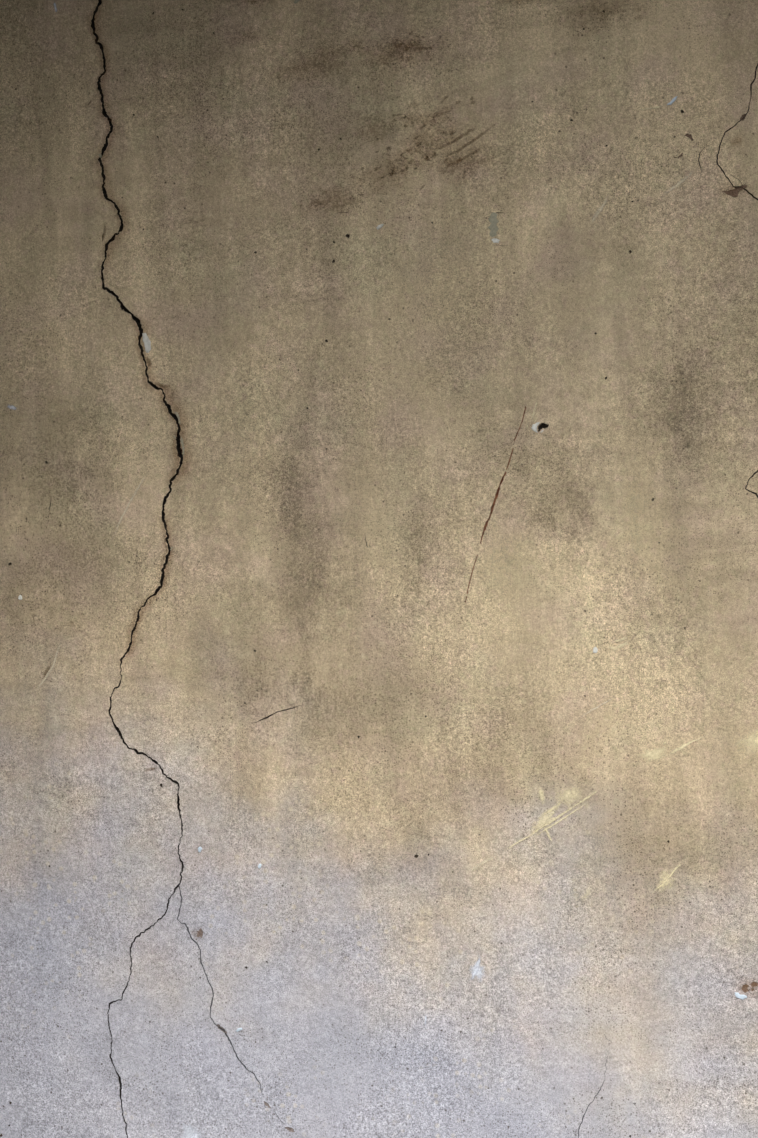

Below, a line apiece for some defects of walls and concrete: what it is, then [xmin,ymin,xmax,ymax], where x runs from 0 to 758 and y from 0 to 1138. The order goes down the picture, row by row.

crack [91,0,279,1138]
crack [698,64,758,200]